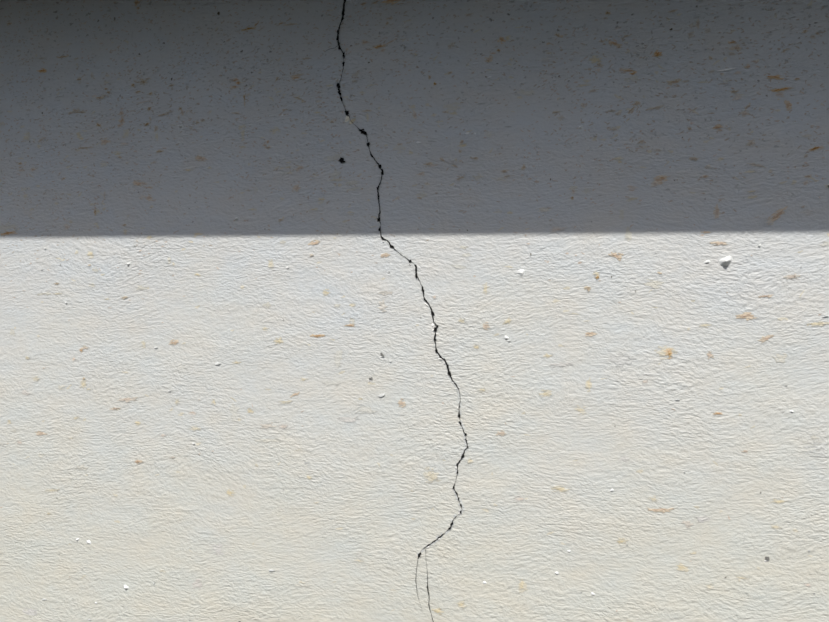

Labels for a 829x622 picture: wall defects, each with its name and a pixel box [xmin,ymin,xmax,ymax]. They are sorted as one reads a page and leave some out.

crack [326,0,468,622]